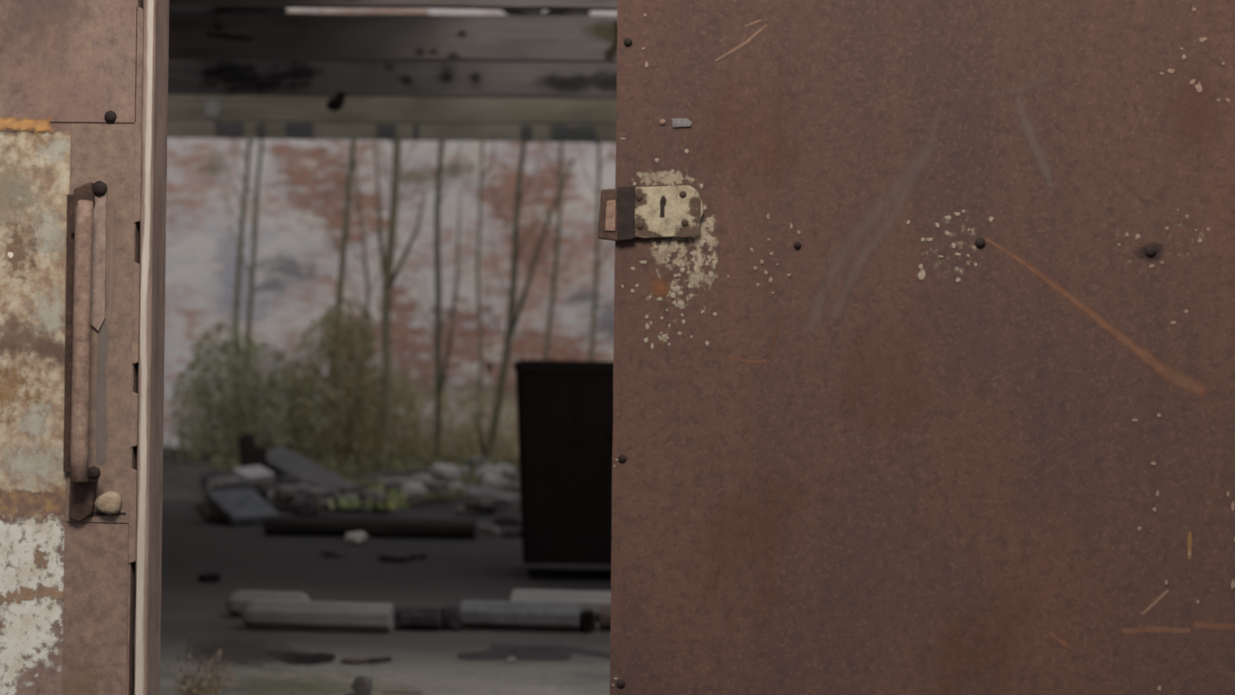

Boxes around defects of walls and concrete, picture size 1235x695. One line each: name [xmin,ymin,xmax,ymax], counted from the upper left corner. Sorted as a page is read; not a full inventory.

corrosion [0,117,52,132]
peeling [632,158,703,188]
corrosion [7,224,36,278]
peeling [622,205,729,349]
corrosion [984,237,1206,396]
corrosion [0,322,65,370]
corrosion [0,490,65,522]
peeling [0,514,65,695]